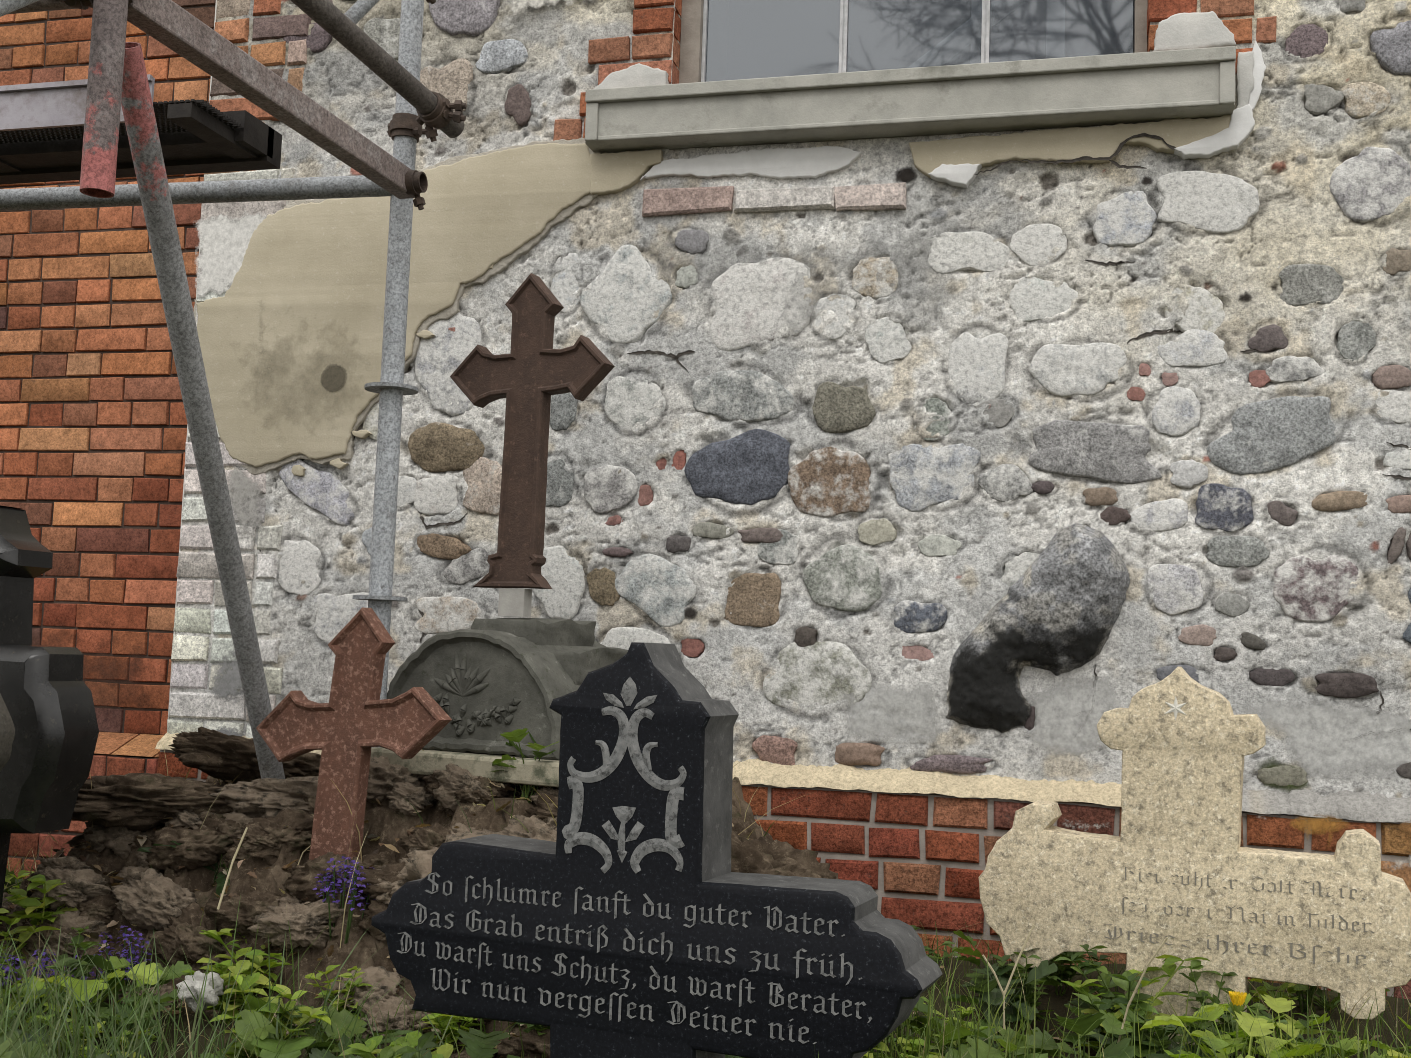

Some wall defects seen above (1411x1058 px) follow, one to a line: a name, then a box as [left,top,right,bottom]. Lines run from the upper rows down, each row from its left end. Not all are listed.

peeling [512,0,573,15]
spalling [896,41,1266,188]
peeling [404,138,862,373]
peeling [193,196,391,533]
water stain [304,357,346,393]